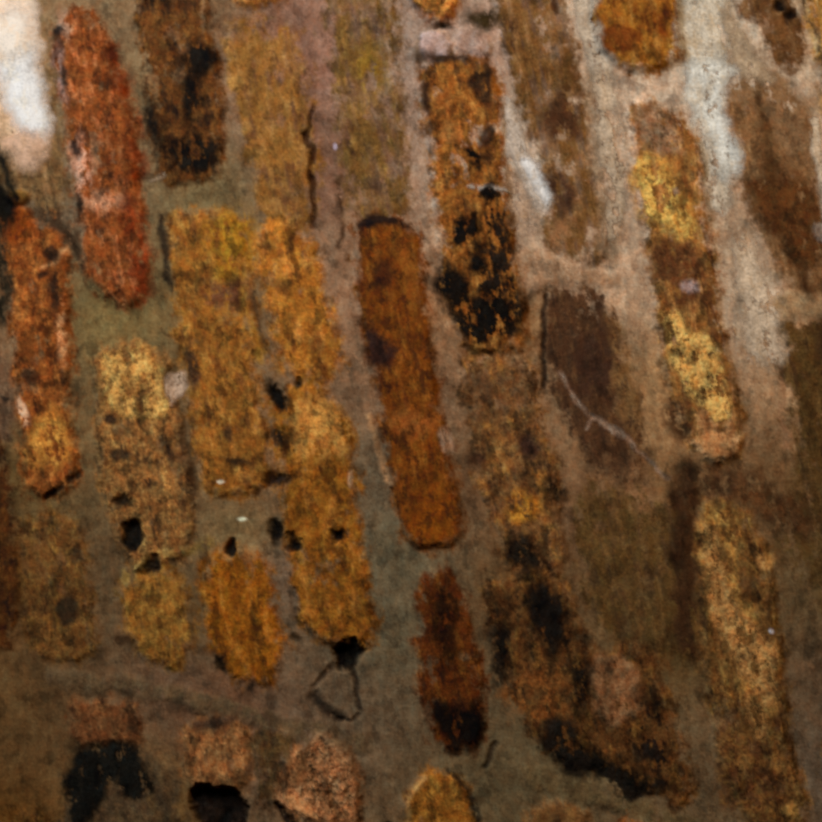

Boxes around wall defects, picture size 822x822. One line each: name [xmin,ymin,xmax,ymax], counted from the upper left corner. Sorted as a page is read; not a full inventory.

efflorescence [0,0,51,167]
efflorescence [505,98,551,237]
efflorescence [574,0,627,239]
efflorescence [678,0,774,216]
damp [747,97,822,293]
efflorescence [732,234,782,363]
hole [192,785,249,822]
spalling [281,744,356,821]